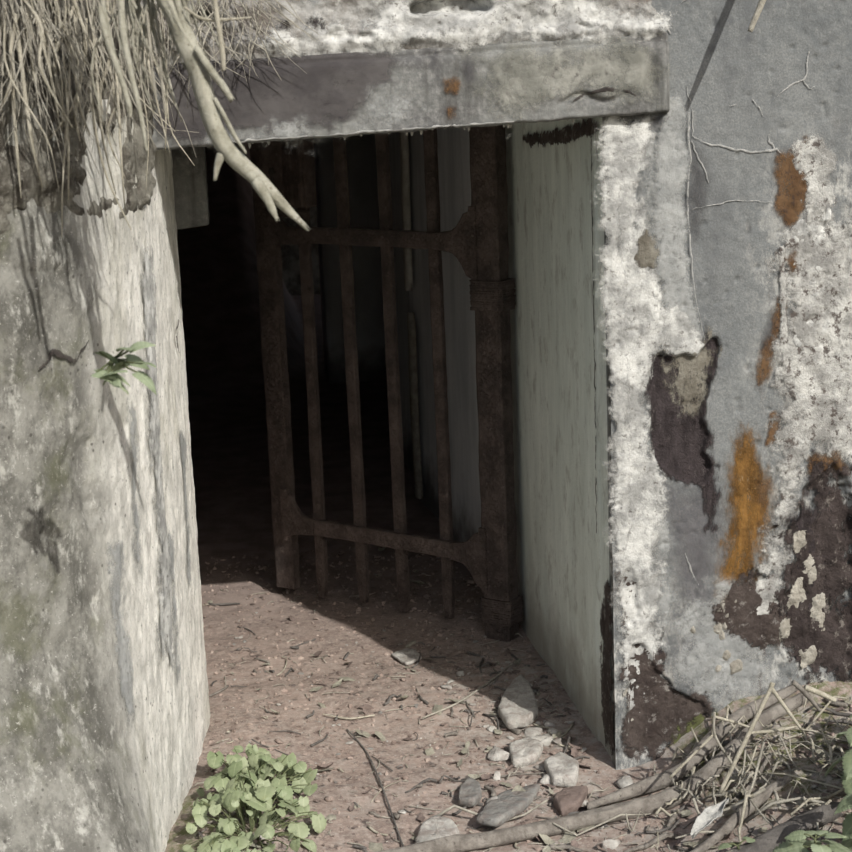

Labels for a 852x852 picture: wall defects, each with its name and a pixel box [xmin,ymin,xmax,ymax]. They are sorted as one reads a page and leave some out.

water stain [211,0,670,144]
crack [573,87,636,101]
crack [687,90,787,183]
crack [729,51,814,117]
corrosion [774,136,809,226]
spalling [641,326,723,488]
water stain [598,97,775,713]
corrosion [756,298,787,385]
water stain [755,136,852,615]
corrosion [716,431,773,586]
spalling [709,449,852,684]
spalling [600,570,714,761]